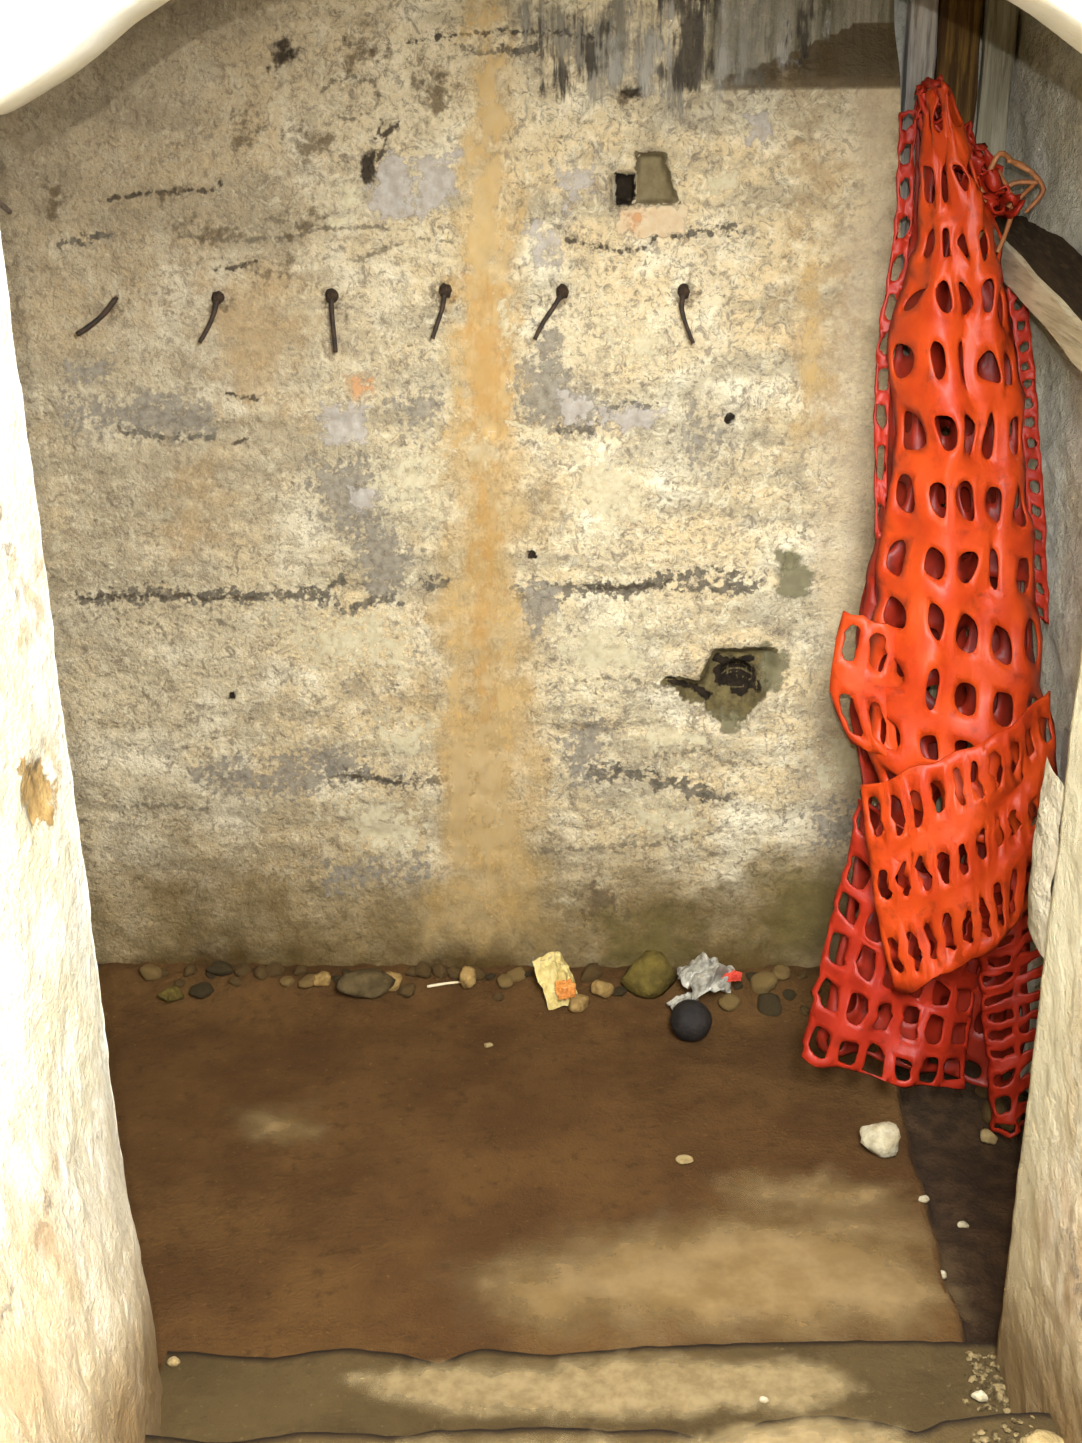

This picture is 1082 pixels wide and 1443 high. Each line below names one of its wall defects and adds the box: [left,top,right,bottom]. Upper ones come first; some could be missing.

damp [521,0,813,117]
spalling [541,151,690,239]
peeling [673,394,734,486]
spalling [541,607,789,772]